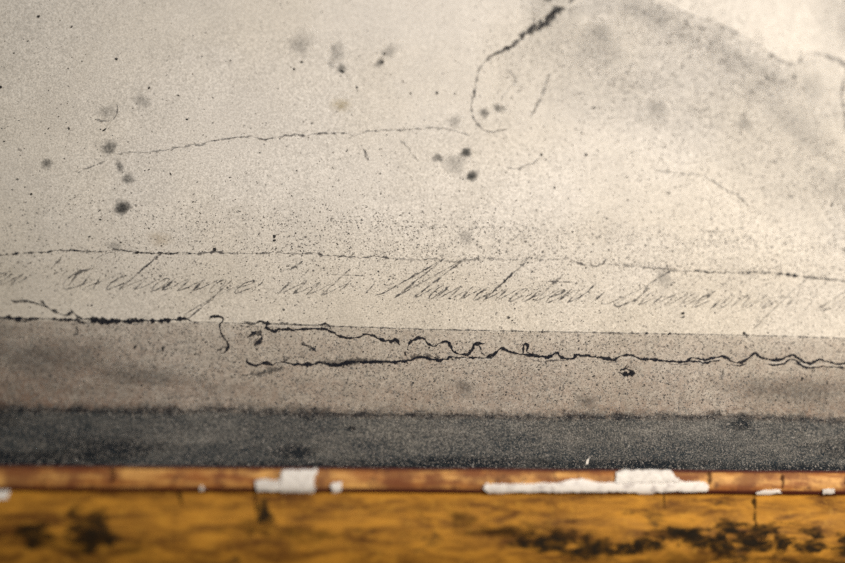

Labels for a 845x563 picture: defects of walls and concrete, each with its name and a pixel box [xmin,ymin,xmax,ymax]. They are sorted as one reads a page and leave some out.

crack [471,0,573,132]
crack [0,300,845,377]